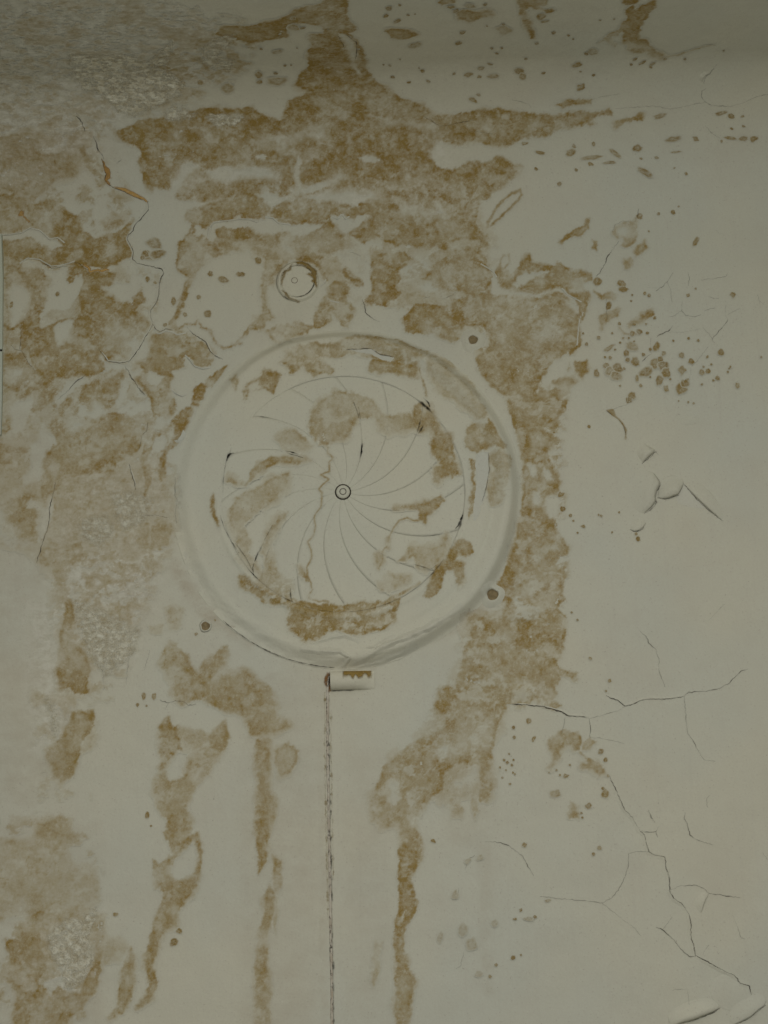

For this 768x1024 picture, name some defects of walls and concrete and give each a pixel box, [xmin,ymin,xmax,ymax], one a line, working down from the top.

water stain [436,0,575,80]
water stain [571,0,725,73]
water stain [565,135,700,179]
crack [98,201,224,387]
water stain [602,306,672,392]
water stain [675,352,695,402]
water stain [208,334,514,644]
crack [515,703,591,732]
crack [606,671,741,709]
water stain [0,638,302,1024]
crack [606,777,751,995]
peeling [668,998,720,1024]